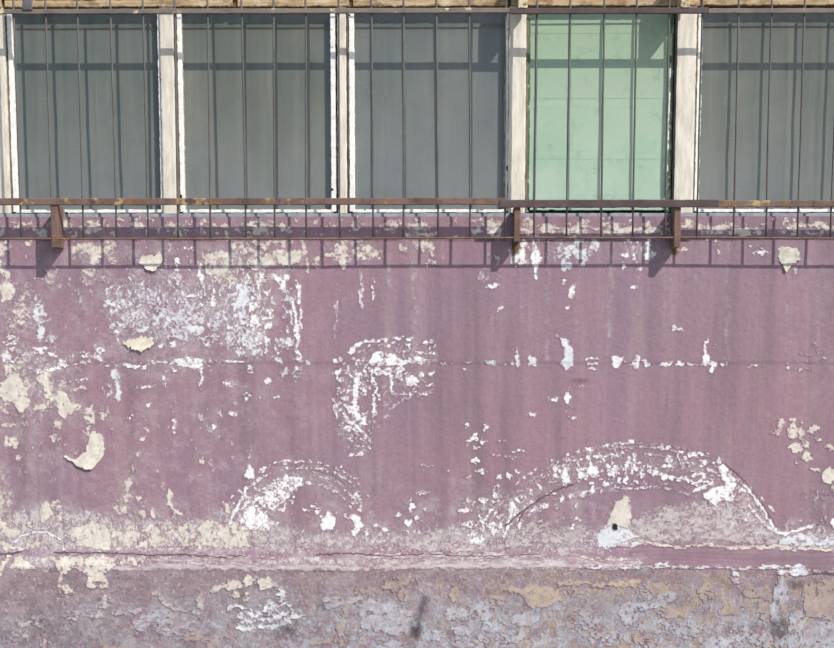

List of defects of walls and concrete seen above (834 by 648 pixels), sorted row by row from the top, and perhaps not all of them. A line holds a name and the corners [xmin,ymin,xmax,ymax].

peeling [0,213,834,648]
crack [504,483,575,528]
crack [0,549,23,557]
crack [53,550,245,558]
crack [315,552,540,560]